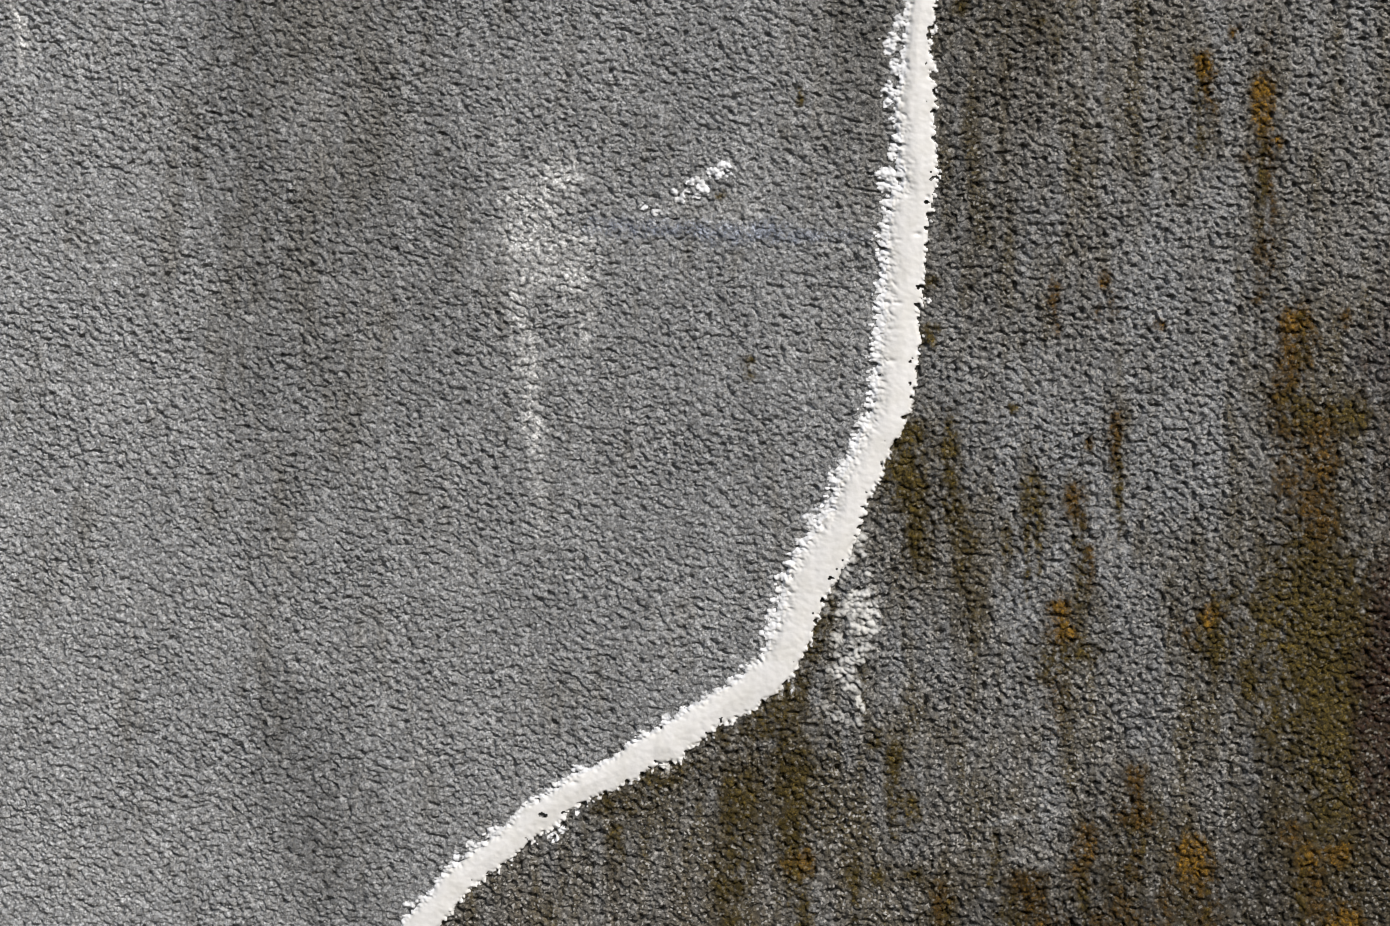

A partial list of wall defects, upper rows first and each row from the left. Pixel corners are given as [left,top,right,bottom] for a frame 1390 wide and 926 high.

rust [1192,51,1219,155]
rust [1238,72,1283,304]
rust [921,322,941,347]
crack [399,0,942,926]
rust [1086,411,1124,540]
rust [1268,304,1373,554]
rust [1036,482,1099,712]
rust [1181,592,1257,704]
rust [985,833,1072,926]
rust [1116,764,1158,881]
rust [1122,835,1217,926]
rust [1280,801,1366,926]